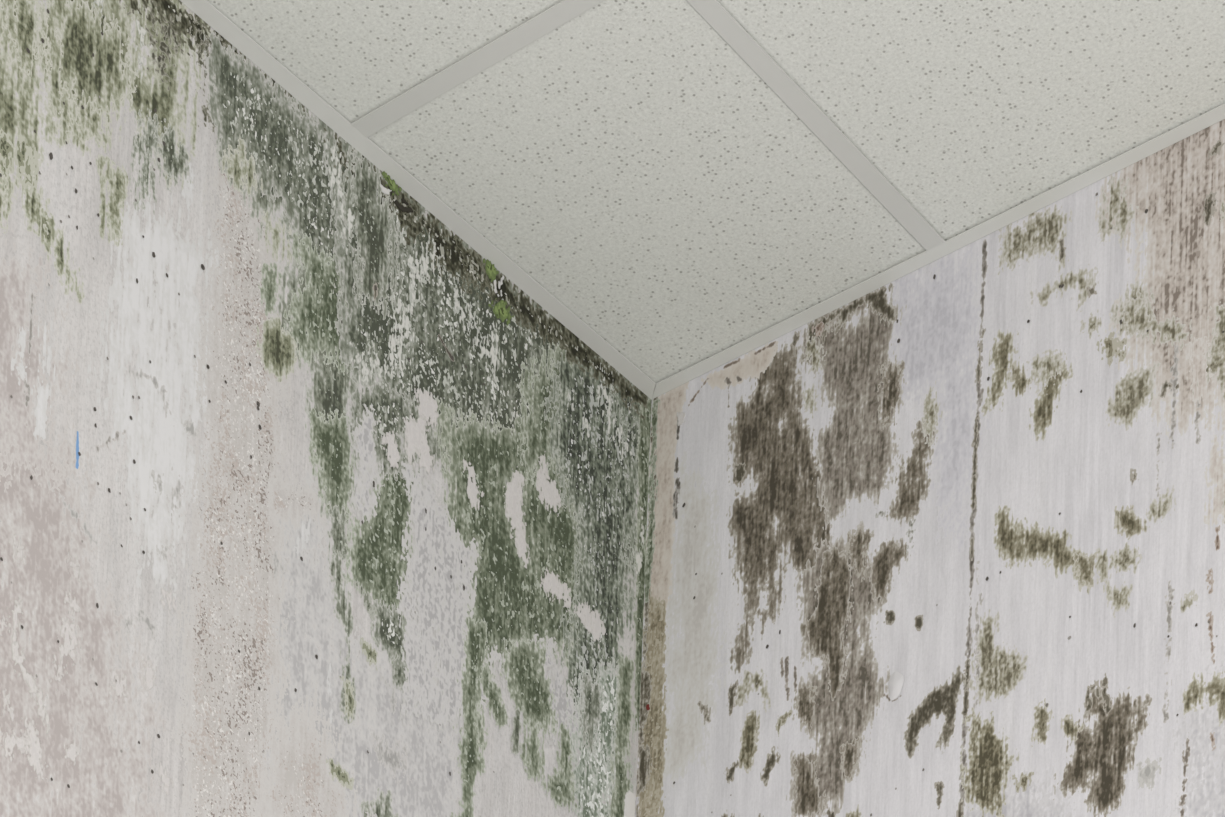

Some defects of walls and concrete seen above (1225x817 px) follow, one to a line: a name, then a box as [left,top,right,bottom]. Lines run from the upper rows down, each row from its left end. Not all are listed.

leakage [129,0,658,575]
leakage [1096,174,1139,246]
leakage [1201,192,1218,226]
leakage [1208,139,1225,159]
leakage [0,162,222,817]
leakage [235,466,480,817]
leakage [560,204,1225,817]